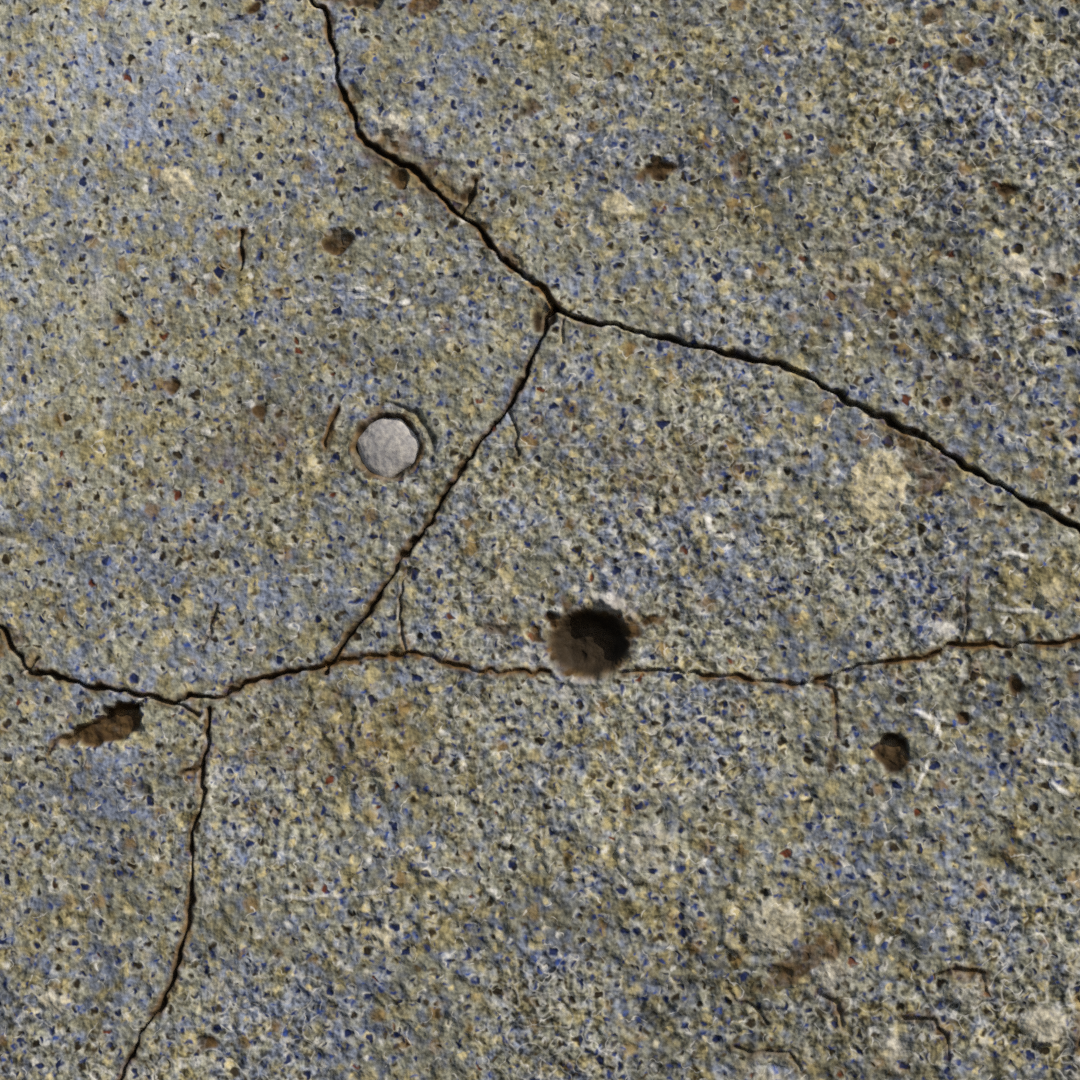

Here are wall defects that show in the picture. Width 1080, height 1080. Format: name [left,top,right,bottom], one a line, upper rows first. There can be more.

crack [223,0,279,27]
crack [308,0,378,149]
crack [966,461,1080,540]
crack [13,172,955,1080]
peeling [543,666,603,689]
crack [620,572,1080,745]
spalling [43,700,145,760]
spalling [871,731,910,778]
crack [931,962,993,1000]
crack [1070,992,1080,1052]